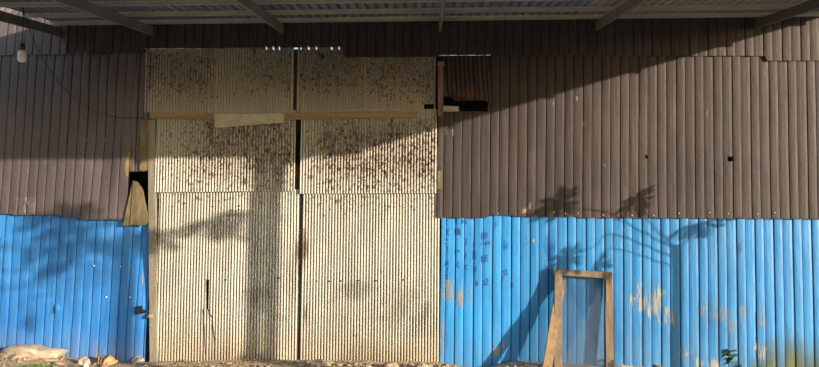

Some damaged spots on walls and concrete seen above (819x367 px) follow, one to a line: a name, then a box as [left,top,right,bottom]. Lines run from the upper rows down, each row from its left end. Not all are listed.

peeling [629,284,674,327]